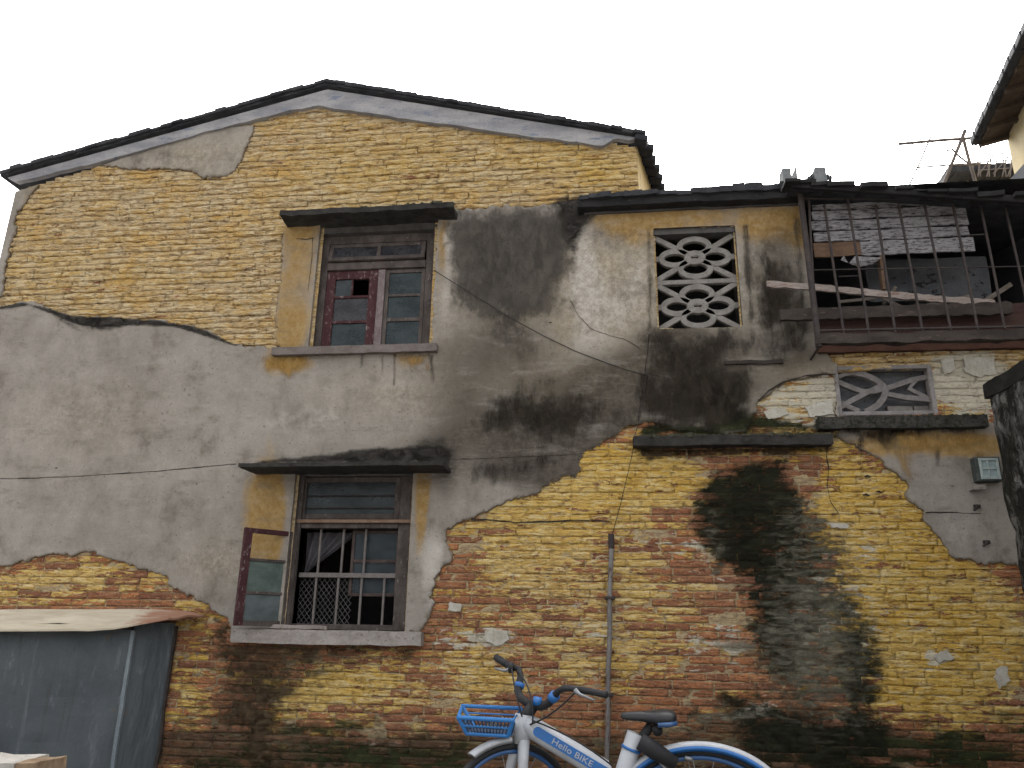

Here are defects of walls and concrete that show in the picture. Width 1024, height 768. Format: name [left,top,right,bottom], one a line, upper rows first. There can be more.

flaking render [0,108,639,348]
damp [553,196,594,248]
damp [744,226,807,351]
damp [486,392,599,439]
damp [640,325,754,427]
flaking render [0,350,1024,768]
crack [471,517,612,525]
damp [638,446,892,768]